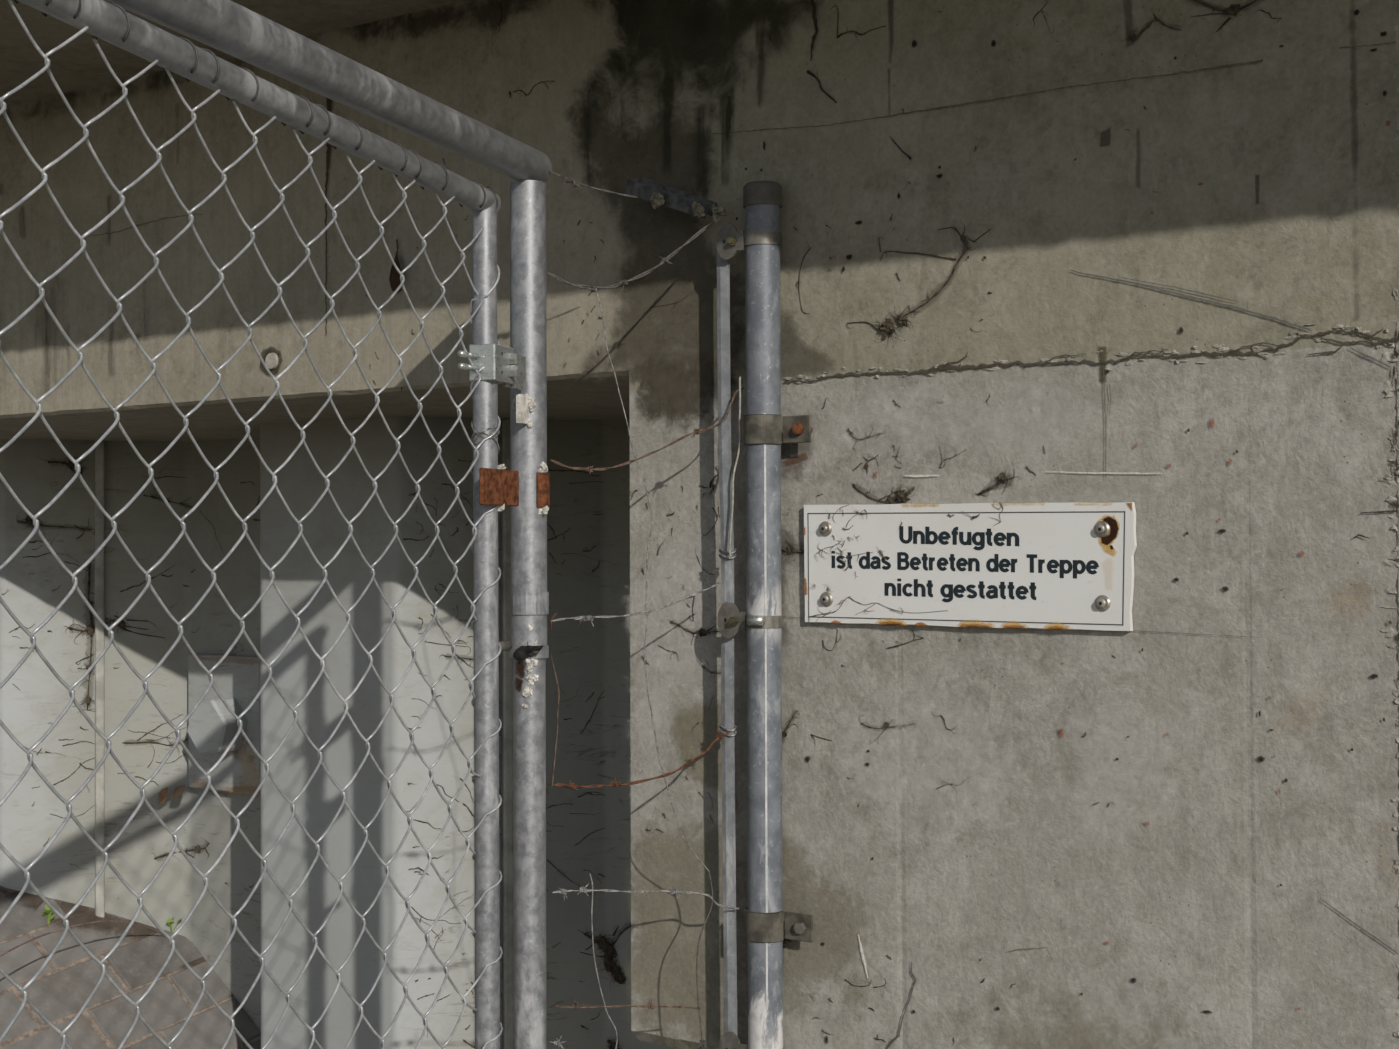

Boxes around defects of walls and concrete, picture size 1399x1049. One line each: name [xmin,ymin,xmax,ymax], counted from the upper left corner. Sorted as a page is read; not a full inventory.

water stain [578,0,812,419]
crack [783,270,1396,477]